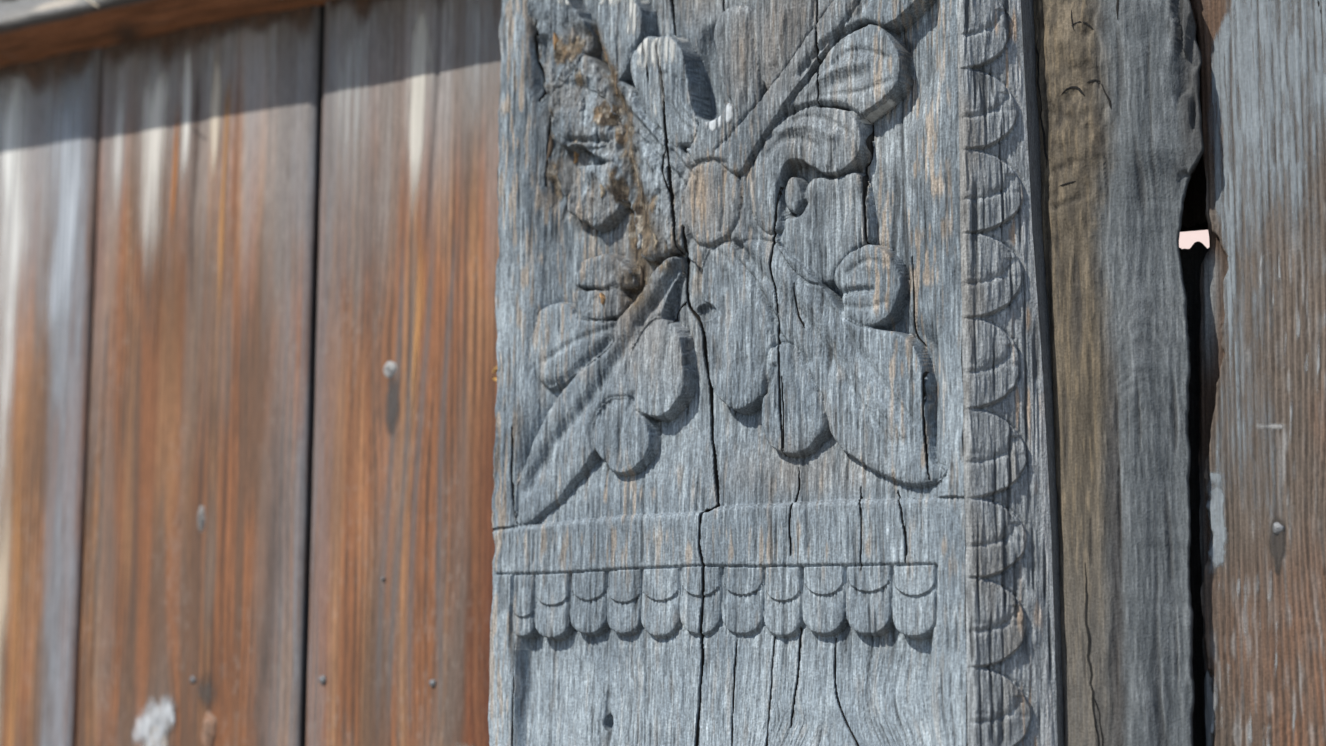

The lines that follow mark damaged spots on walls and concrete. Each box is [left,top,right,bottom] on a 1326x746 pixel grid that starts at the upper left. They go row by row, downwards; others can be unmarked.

crack [815,0,823,108]
crack [862,120,874,245]
crack [642,0,738,746]
crack [769,187,805,556]
crack [766,627,803,746]
crack [835,638,859,746]